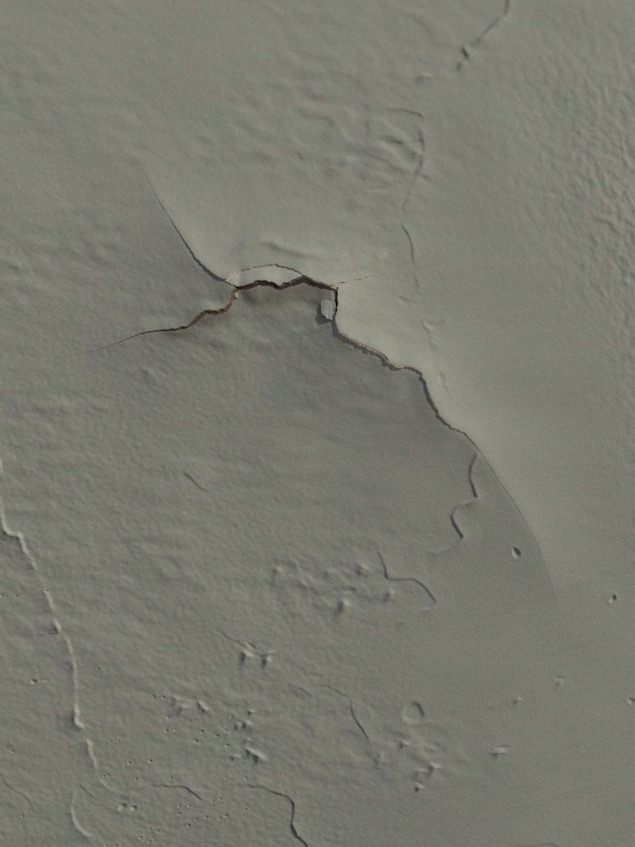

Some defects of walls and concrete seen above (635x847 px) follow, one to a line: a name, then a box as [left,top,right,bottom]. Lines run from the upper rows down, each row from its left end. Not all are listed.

peeling [45,149,563,615]
peeling [156,679,216,725]
peeling [217,699,283,776]